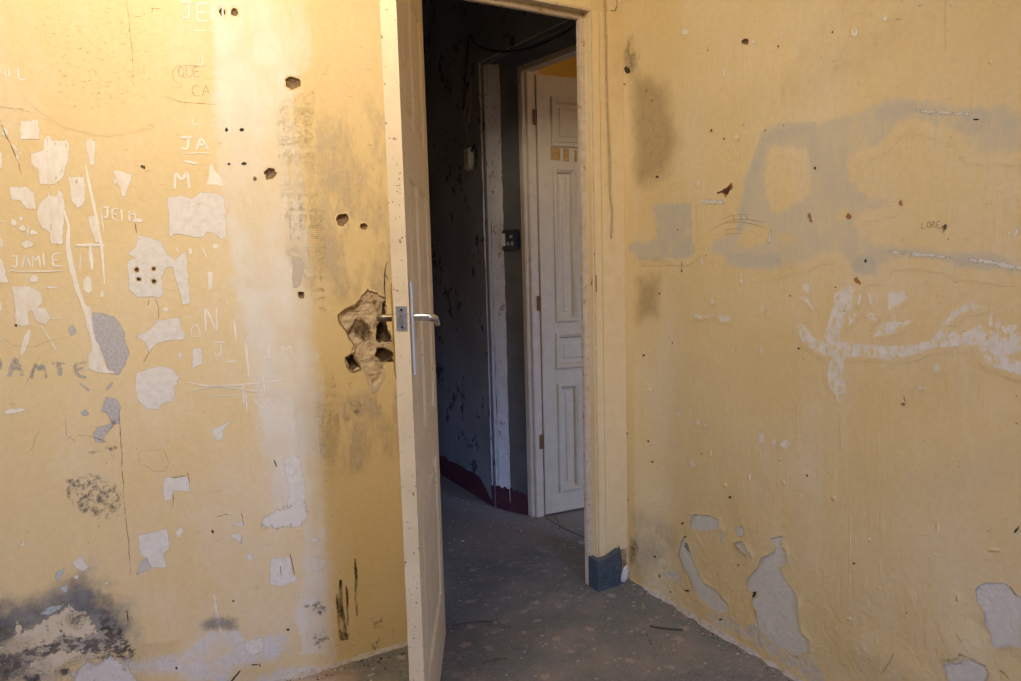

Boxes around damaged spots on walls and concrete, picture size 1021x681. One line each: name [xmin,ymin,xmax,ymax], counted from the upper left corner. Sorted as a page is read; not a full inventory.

spalling [69,305,129,443]
water stain [0,0,376,681]
spalling [337,289,394,386]
peeling [679,514,810,657]
peeling [975,582,1021,650]